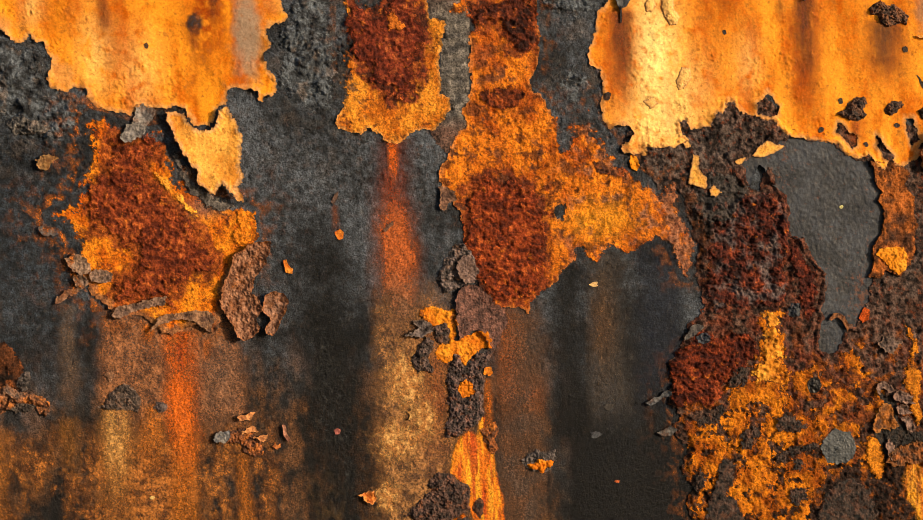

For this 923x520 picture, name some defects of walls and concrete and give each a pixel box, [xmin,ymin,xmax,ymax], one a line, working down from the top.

peeling [0,0,288,211]
corrosion [187,13,202,42]
peeling [587,0,923,197]
corrosion [0,342,32,392]
corrosion [0,447,54,491]
corrosion [34,117,291,520]
water stain [303,252,372,520]
spalling [472,498,484,519]
water stain [553,257,693,520]
corrosion [335,0,923,520]